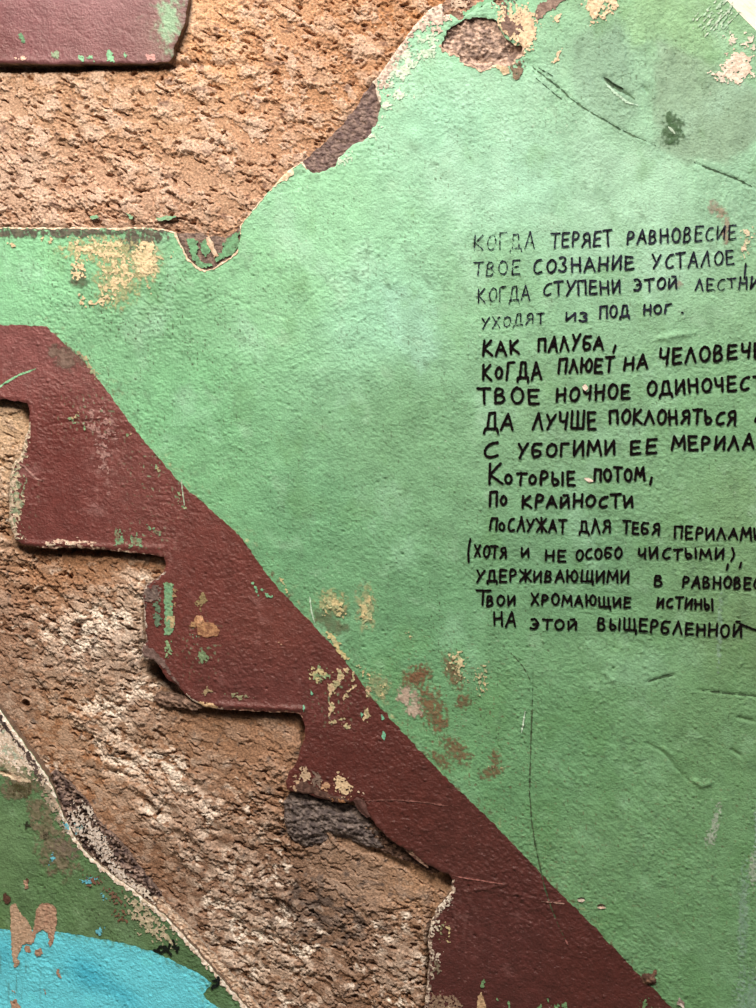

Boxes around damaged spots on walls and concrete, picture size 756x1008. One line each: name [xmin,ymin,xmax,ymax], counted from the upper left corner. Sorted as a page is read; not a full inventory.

peeling [581,0,619,26]
peeling [707,31,755,86]
crack [527,62,656,146]
spalling [603,77,638,106]
spalling [0,0,563,311]
crack [694,162,752,187]
peeling [445,651,489,696]
spalling [0,399,463,1008]
spalling [477,979,510,1008]